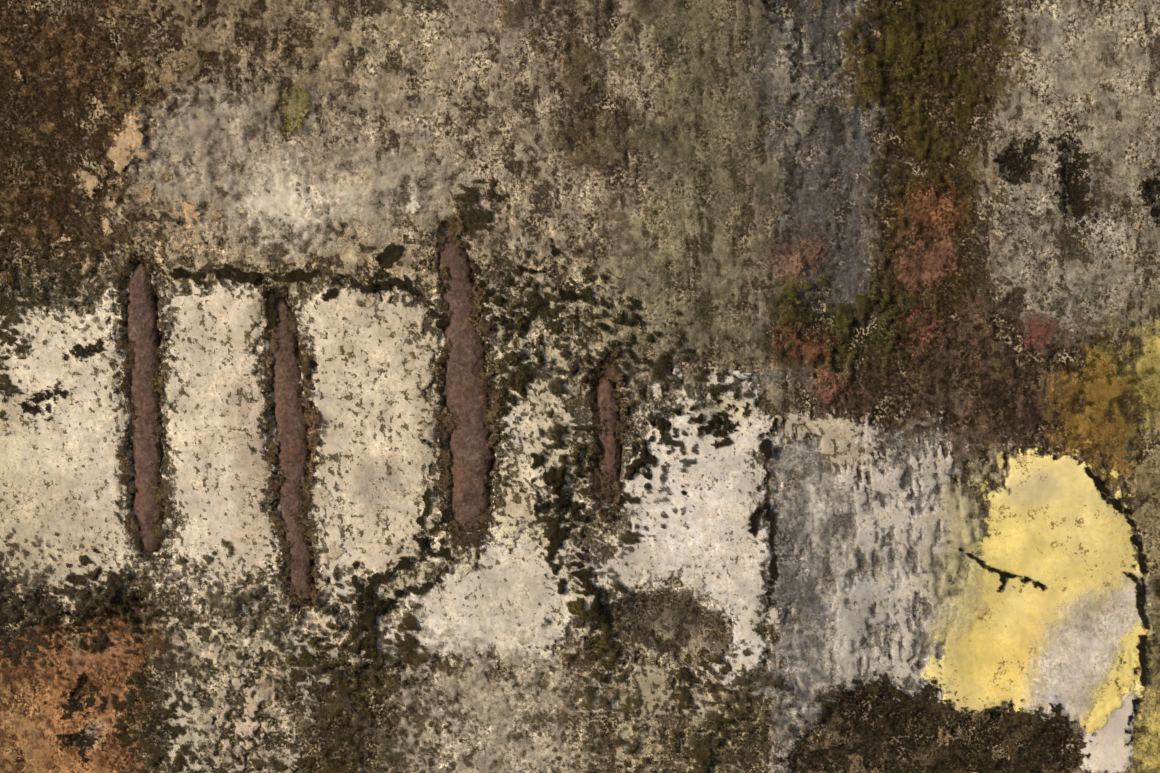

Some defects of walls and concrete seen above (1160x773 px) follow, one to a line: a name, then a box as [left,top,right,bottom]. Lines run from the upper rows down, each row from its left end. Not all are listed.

peeling [71,113,175,236]
peeling [172,199,224,253]
corrosion [439,231,494,533]
peeling [0,211,1154,773]
corrosion [596,373,622,504]
crack [618,405,779,658]
crack [958,548,1047,593]
crack [1084,466,1154,746]